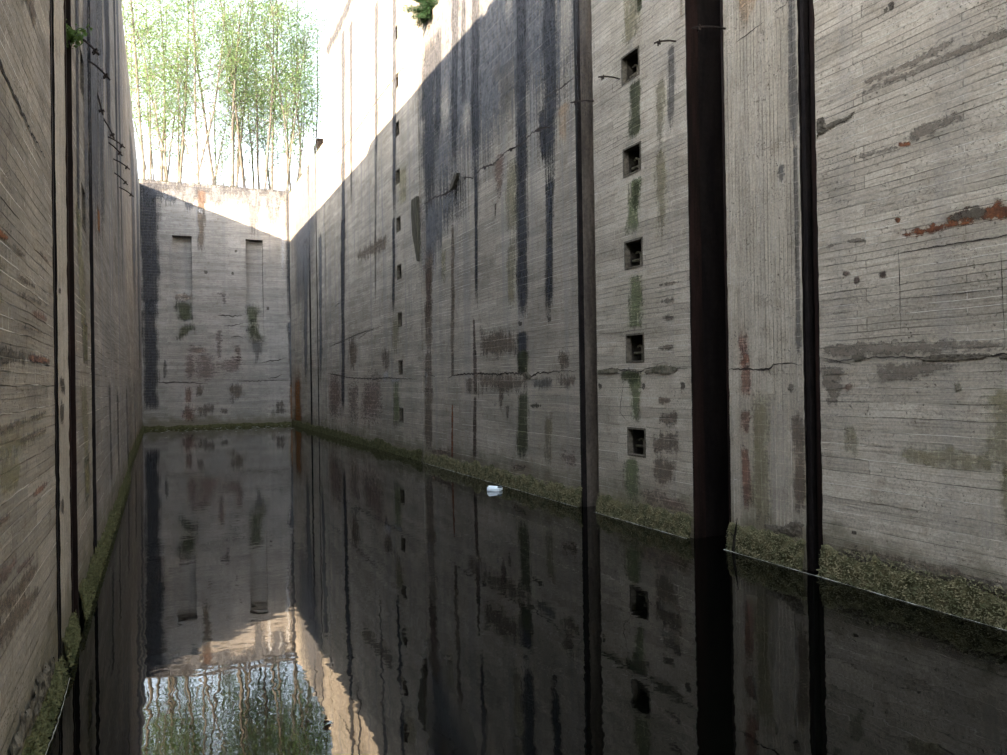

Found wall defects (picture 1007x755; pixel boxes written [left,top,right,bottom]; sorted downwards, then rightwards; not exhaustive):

leakage [494,154,504,216]
rust [895,199,1007,238]
leakage [117,175,160,472]
rust [289,371,302,421]
crack [328,370,576,380]